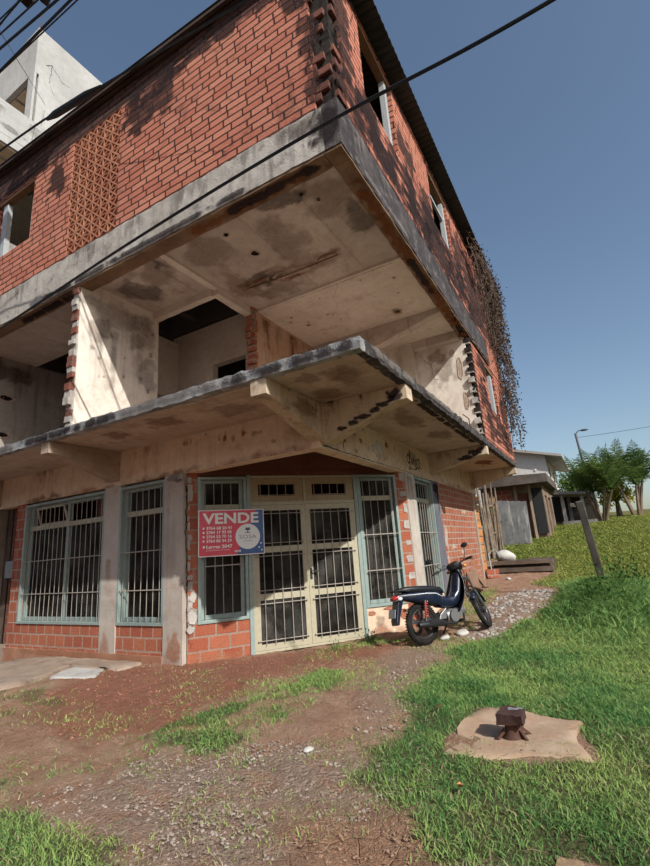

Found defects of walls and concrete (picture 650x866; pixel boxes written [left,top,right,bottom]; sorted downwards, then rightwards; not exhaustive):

damp [121,0,339,146]
damp [333,0,498,362]
spalling [244,252,339,290]
flaking render [186,590,198,635]